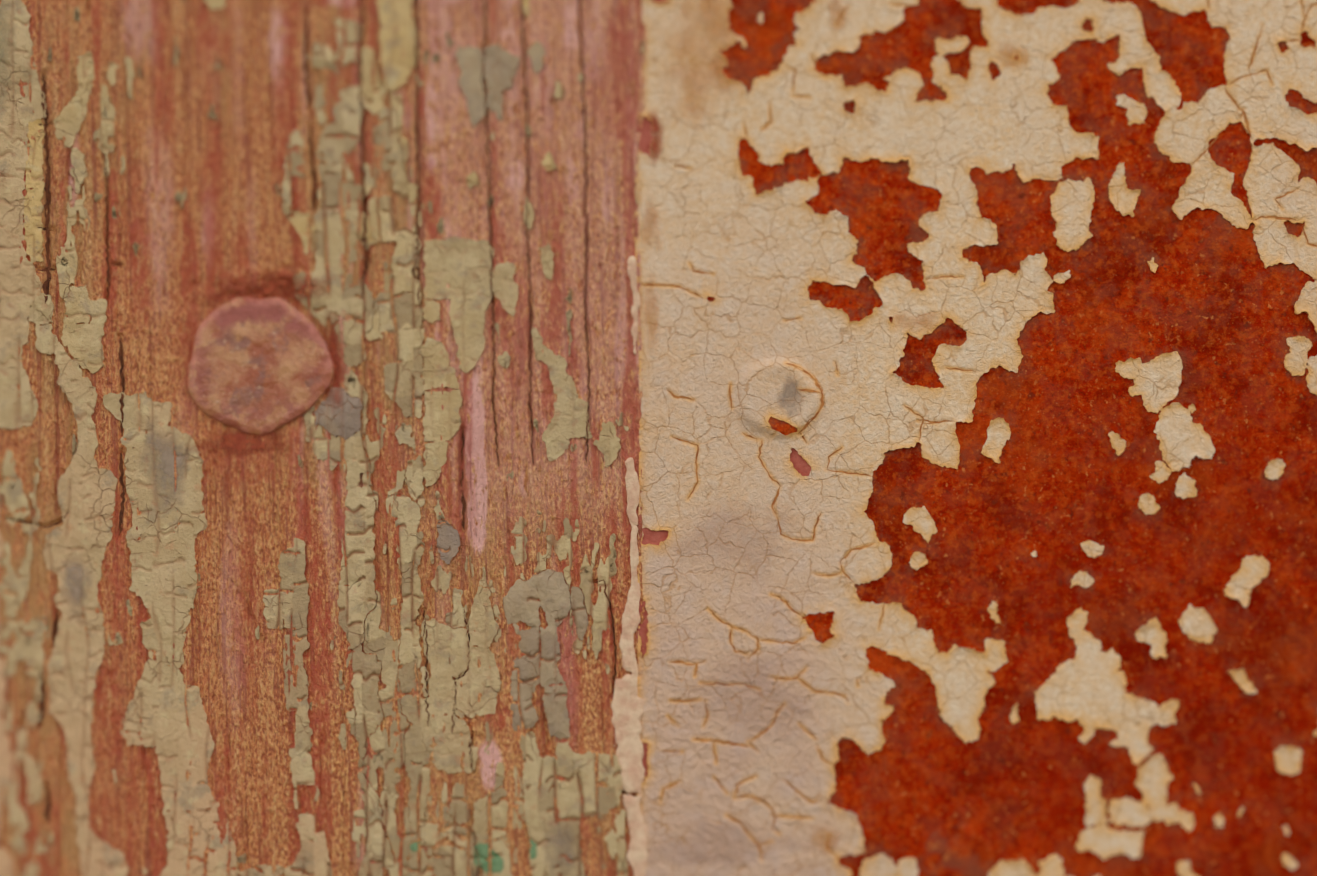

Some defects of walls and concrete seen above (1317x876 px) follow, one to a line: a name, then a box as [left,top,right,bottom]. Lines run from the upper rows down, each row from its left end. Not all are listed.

peeling [719,0,816,93]
crack [1191,0,1317,171]
peeling [738,138,942,323]
crack [1255,189,1317,247]
peeling [0,0,333,876]
corrosion [327,337,339,391]
peeling [274,0,668,876]
crack [729,384,821,541]
crack [786,363,870,476]
peeling [814,0,1317,876]
peeling [802,611,835,644]
crack [622,594,858,860]